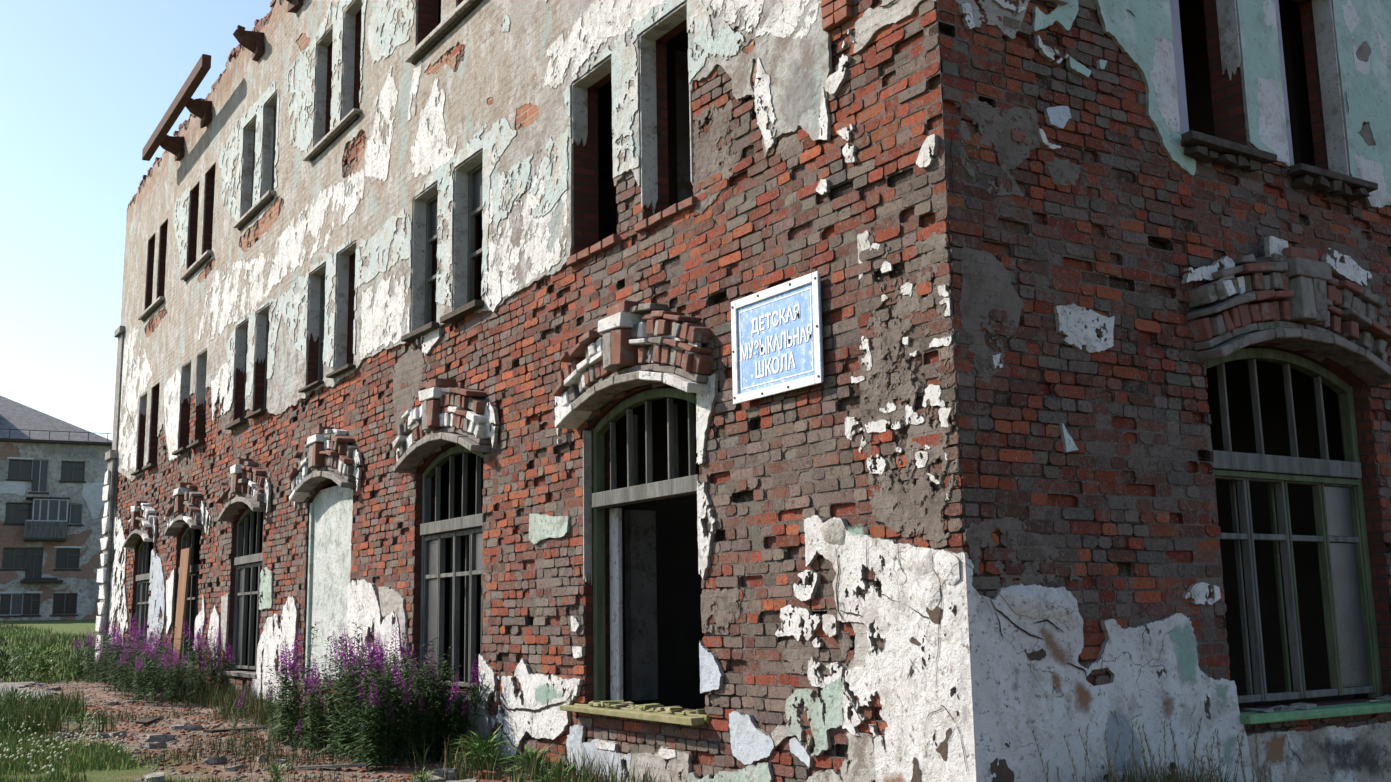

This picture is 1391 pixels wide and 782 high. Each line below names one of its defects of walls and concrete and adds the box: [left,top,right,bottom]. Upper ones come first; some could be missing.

peeling [173,0,821,423]
peeling [818,29,858,163]
peeling [916,134,939,168]
peeling [1032,106,1071,150]
peeling [118,307,182,472]
flaking render [0,481,129,646]
peeling [146,517,176,655]
peeling [252,567,299,711]
peeling [346,579,409,734]
crack [835,541,967,770]
peeling [468,230,1391,782]
crack [989,597,1090,681]